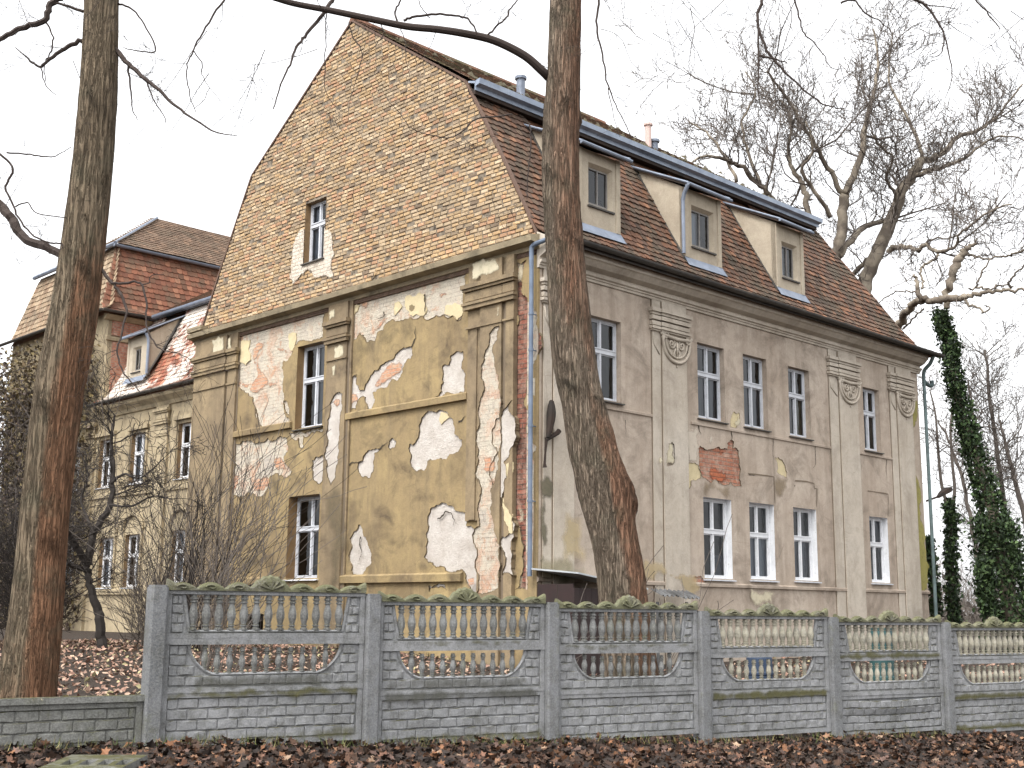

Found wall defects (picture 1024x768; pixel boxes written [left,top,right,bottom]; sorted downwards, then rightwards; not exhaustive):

flaking render [109,321,191,404]
spalling [212,259,498,497]
spalling [424,261,544,594]
spalling [688,412,741,489]
spalling [348,525,371,575]